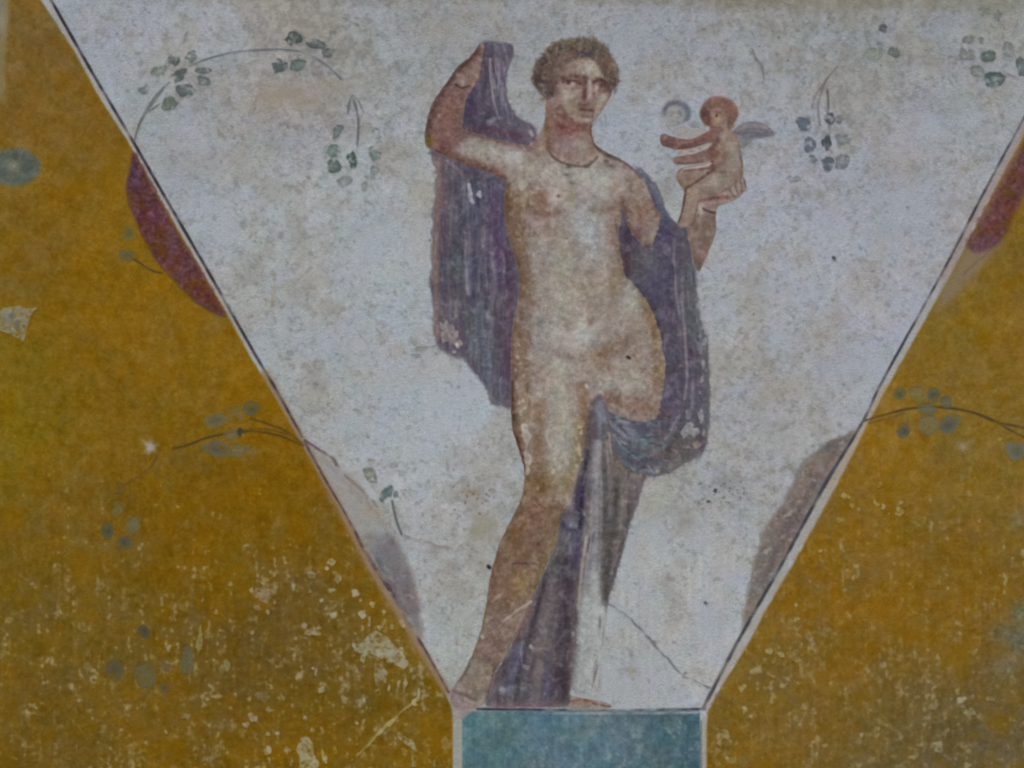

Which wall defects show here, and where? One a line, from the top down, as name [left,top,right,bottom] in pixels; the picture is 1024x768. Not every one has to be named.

flaking render [0,305,38,342]
peeling [241,557,433,768]
crack [603,601,723,699]
peeling [737,602,814,719]
peeling [954,687,996,716]
peeling [716,728,737,764]
peeling [907,727,950,760]